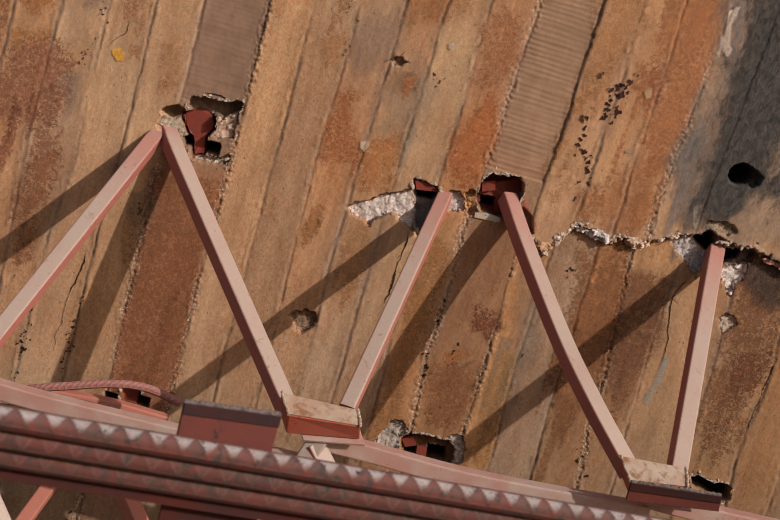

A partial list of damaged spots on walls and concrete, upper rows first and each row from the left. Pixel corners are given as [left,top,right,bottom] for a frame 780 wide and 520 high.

spalling [157,115,187,136]
spalling [184,92,245,138]
corrosion [442,7,524,197]
corrosion [0,27,76,282]
spalling [348,167,522,235]
spalling [532,205,780,273]
spalling [720,263,750,295]
spalling [291,310,315,332]
crack [660,277,688,364]
spalling [374,420,466,464]
spalling [689,471,734,506]